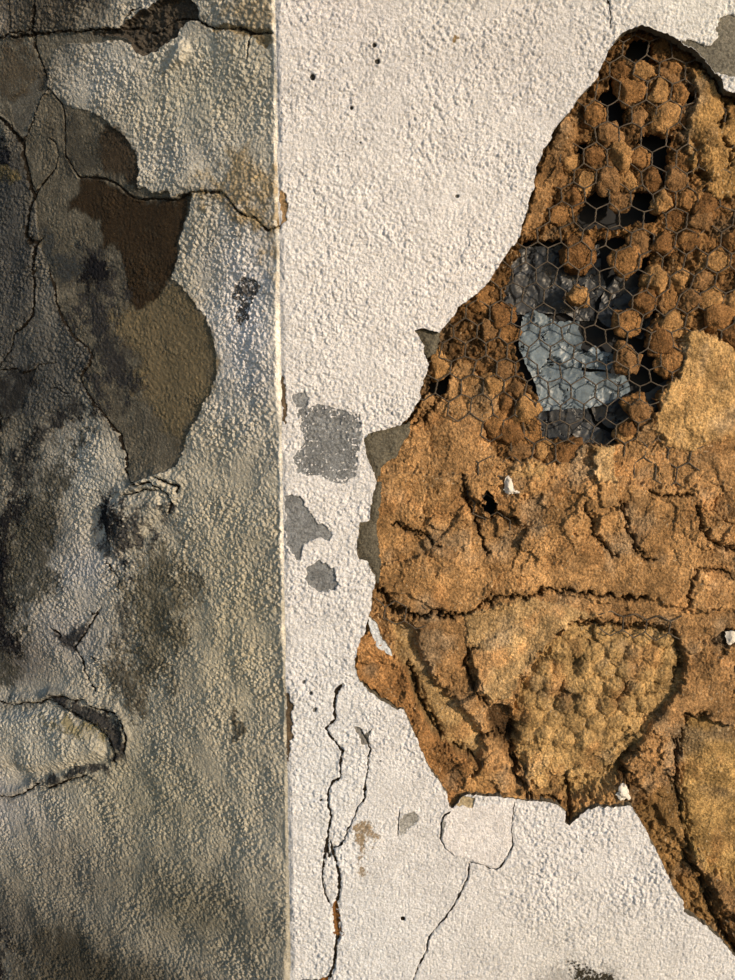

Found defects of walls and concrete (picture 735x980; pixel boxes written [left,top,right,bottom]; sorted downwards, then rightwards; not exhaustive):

peeling [0,0,217,482]
leakage [0,111,220,700]
crack [0,1,280,483]
spalling [281,14,735,956]
crack [308,684,371,980]
crack [413,803,515,980]